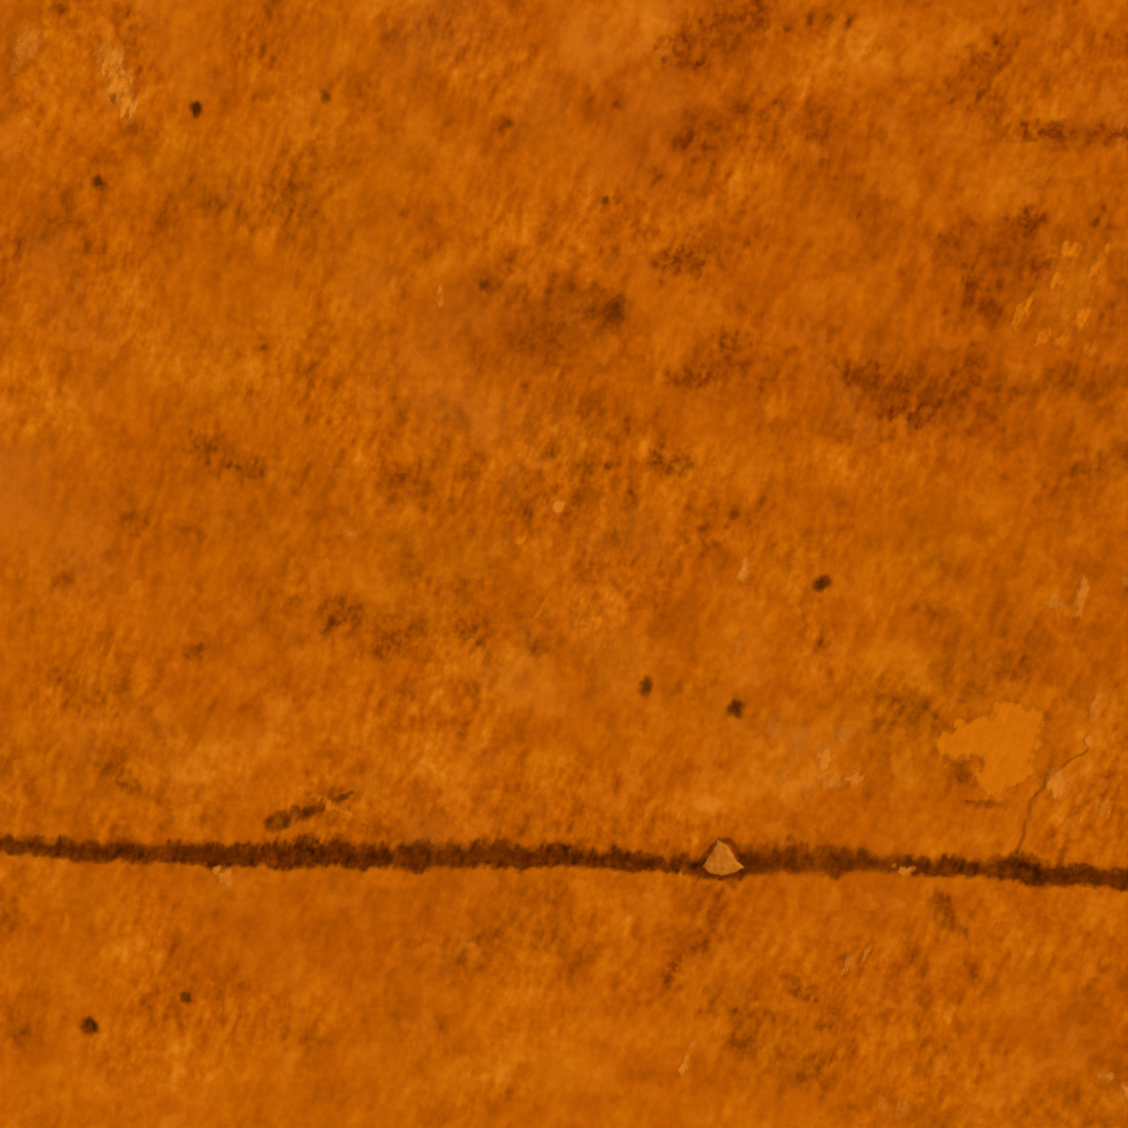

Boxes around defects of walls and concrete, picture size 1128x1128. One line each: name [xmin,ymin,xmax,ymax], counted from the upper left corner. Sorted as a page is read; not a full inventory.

peeling [935,701,1045,797]
peeling [1046,770,1068,799]
crack [0,791,1128,892]
spalling [702,839,744,876]